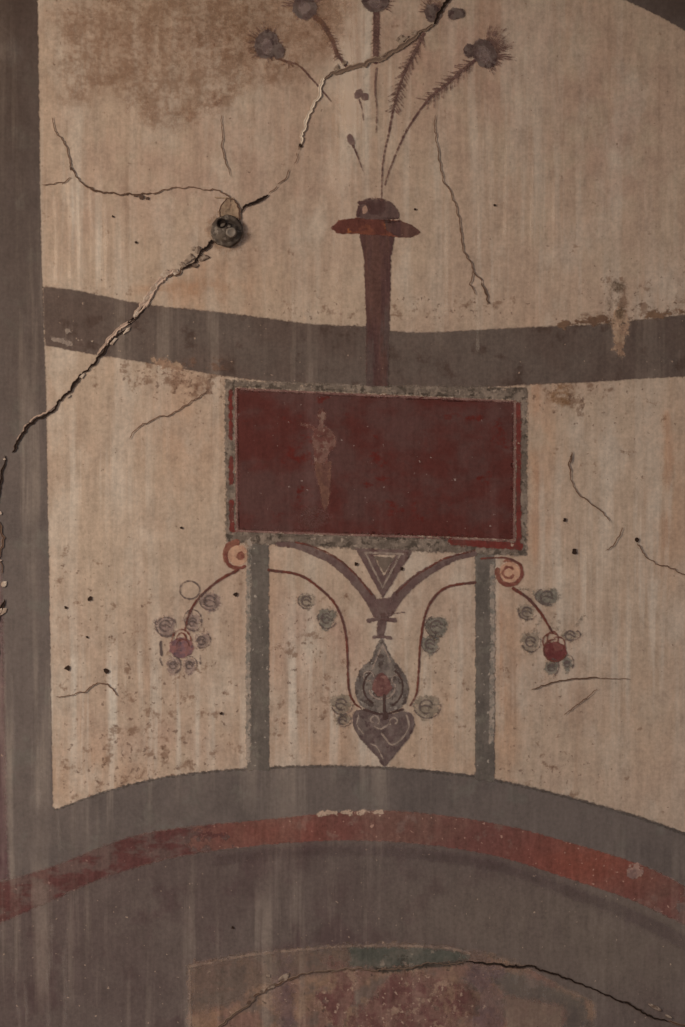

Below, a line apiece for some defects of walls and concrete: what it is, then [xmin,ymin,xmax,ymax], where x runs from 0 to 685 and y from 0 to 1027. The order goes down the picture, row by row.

crack [434,115,489,303]
crack [0,0,450,615]
peeling [557,306,685,355]
crack [568,453,685,575]
crack [57,682,118,698]
crack [218,961,685,1027]